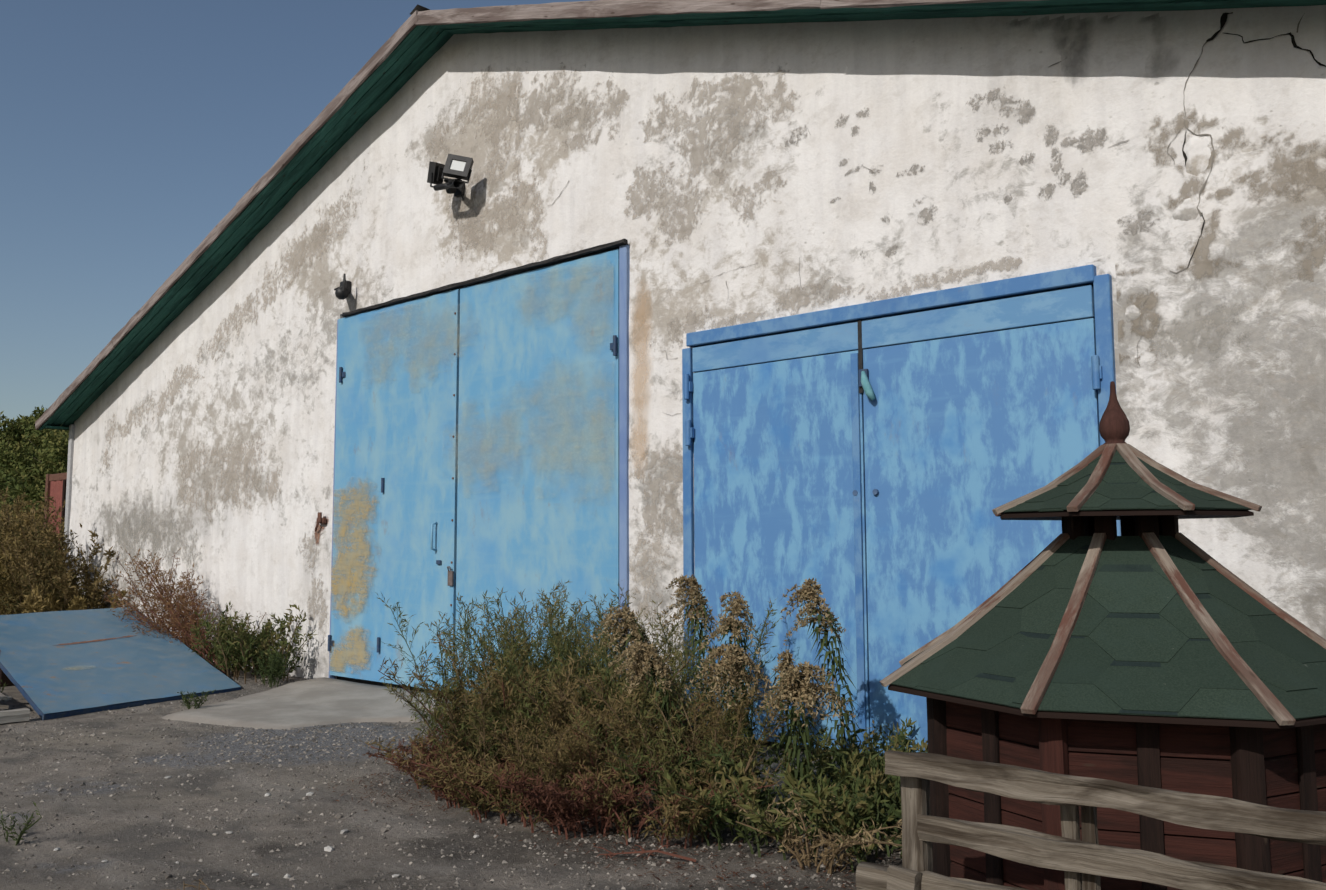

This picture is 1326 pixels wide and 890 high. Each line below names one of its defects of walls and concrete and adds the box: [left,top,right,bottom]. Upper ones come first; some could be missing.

peeling [428,69,629,251]
peeling [624,69,807,245]
spalling [837,108,869,137]
spalling [840,159,880,191]
spalling [969,88,1035,153]
spalling [1039,125,1107,199]
spalling [1118,210,1158,236]
crack [1137,12,1326,366]
peeling [1149,111,1326,282]
peeling [1115,265,1246,361]
corrosion [315,486,376,616]
corrosion [330,628,369,672]